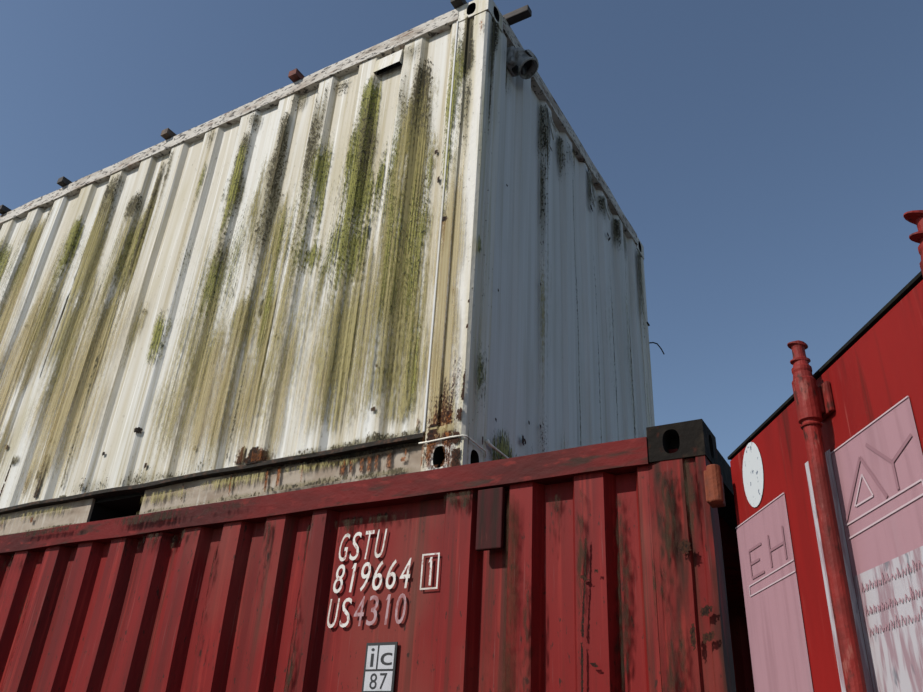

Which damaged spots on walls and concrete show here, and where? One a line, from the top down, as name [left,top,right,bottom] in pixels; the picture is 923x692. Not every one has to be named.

leakage [0,152,173,488]
leakage [153,16,474,459]
rust [197,176,465,504]